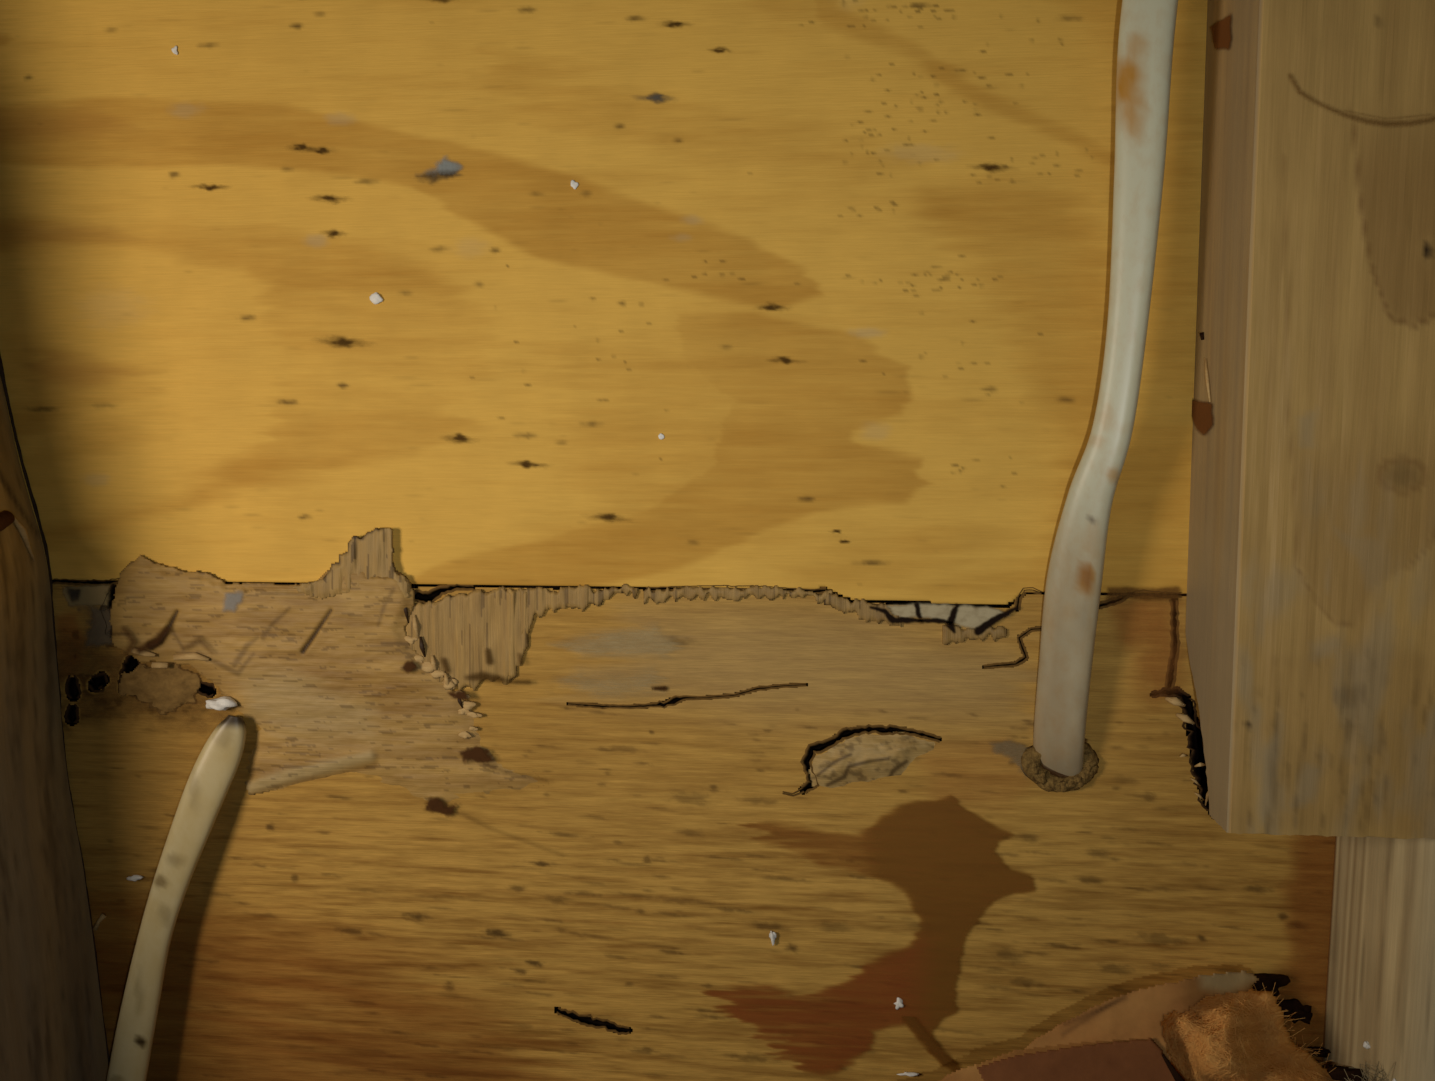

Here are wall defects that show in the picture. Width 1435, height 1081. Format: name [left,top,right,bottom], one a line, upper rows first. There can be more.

damp [425,160,461,180]
damp [331,338,352,346]
crack [53,578,120,636]
crack [415,584,475,604]
spalling [404,584,639,739]
crack [646,585,826,594]
crack [984,587,1044,669]
crack [1099,589,1190,702]
crack [568,683,807,709]
damp [706,799,1033,1069]